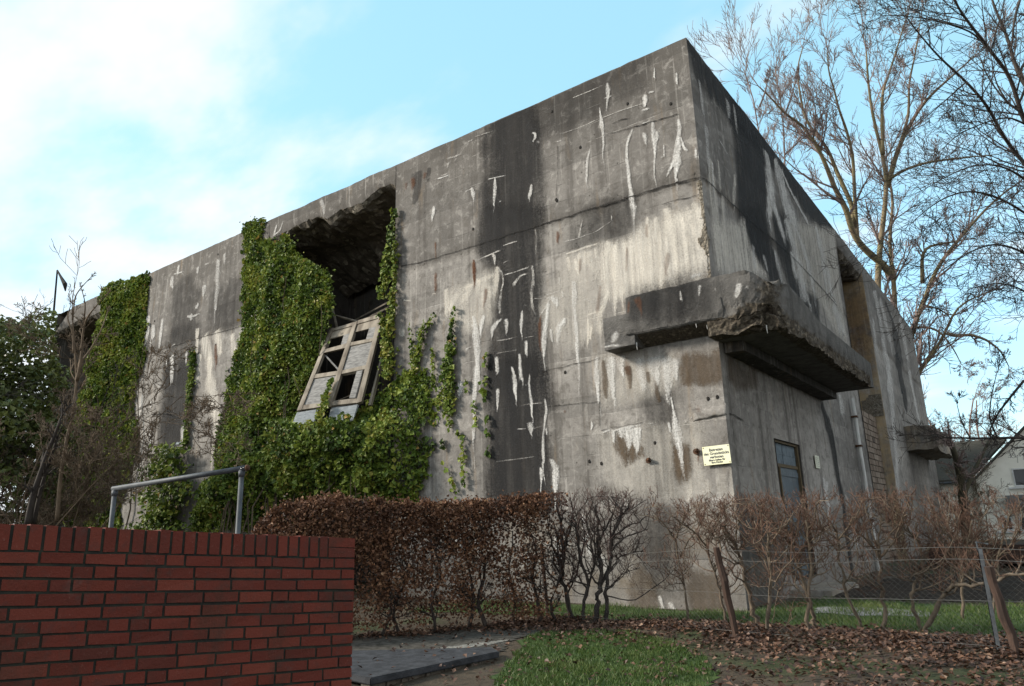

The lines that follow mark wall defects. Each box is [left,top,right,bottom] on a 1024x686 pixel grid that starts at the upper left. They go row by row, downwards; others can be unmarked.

damp [435,39,847,509]